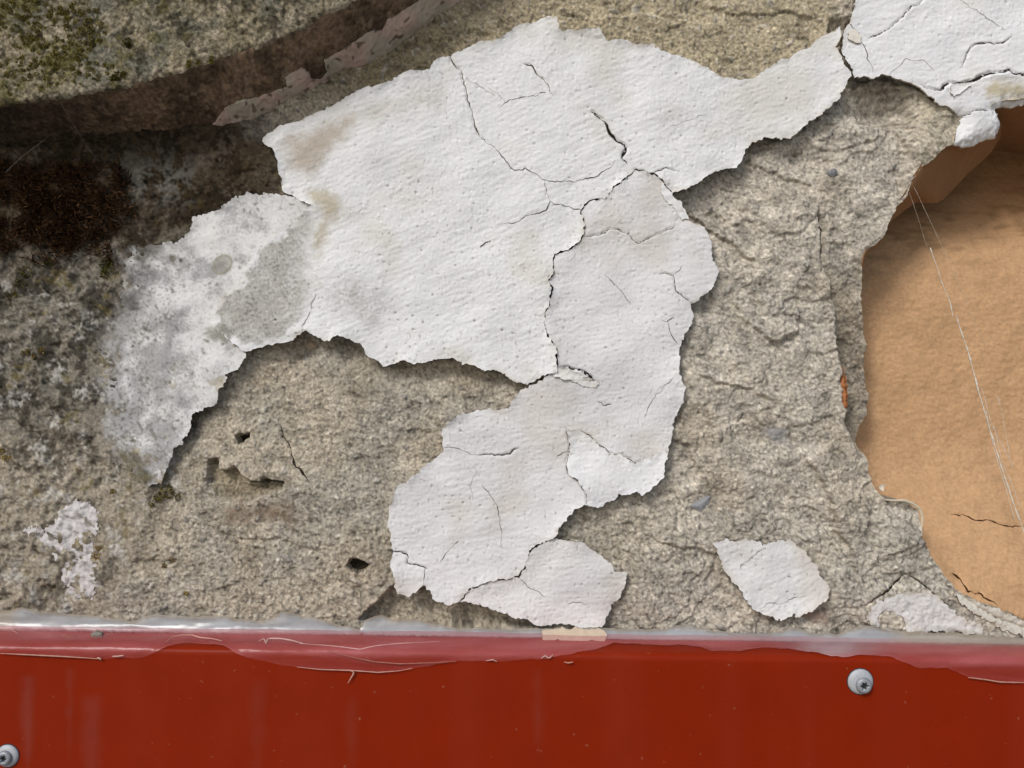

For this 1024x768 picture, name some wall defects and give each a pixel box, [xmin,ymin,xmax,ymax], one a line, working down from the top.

crack [448,54,679,406]
peeling [88,0,1024,641]
crack [664,268,688,343]
crack [280,425,308,480]
peeling [23,498,99,600]
crack [952,514,1020,527]